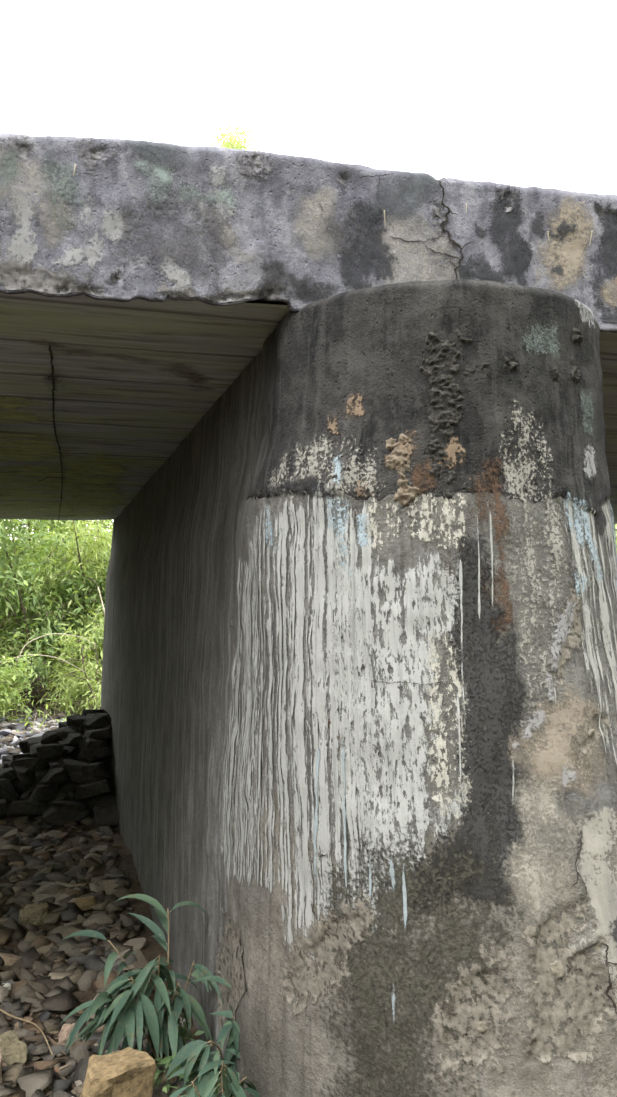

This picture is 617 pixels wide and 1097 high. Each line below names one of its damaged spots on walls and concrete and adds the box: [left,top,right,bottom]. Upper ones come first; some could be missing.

damp [256,172,443,302]
crack [392,172,474,280]
damp [459,185,577,286]
crack [40,344,63,522]
damp [262,434,385,691]
rust [470,457,513,634]
damp [311,391,617,1097]
crack [570,829,587,895]
crack [578,941,617,1014]